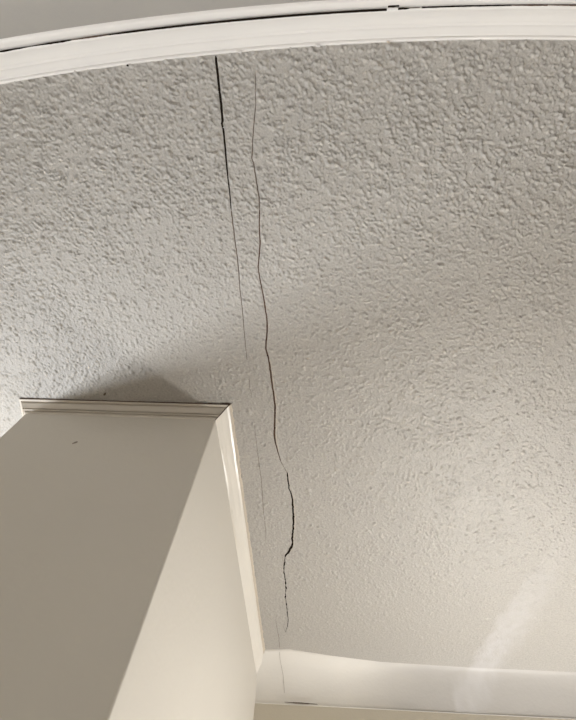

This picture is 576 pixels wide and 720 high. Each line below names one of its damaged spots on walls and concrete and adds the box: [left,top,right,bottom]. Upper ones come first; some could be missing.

crack [215,56,247,357]
crack [251,72,296,683]